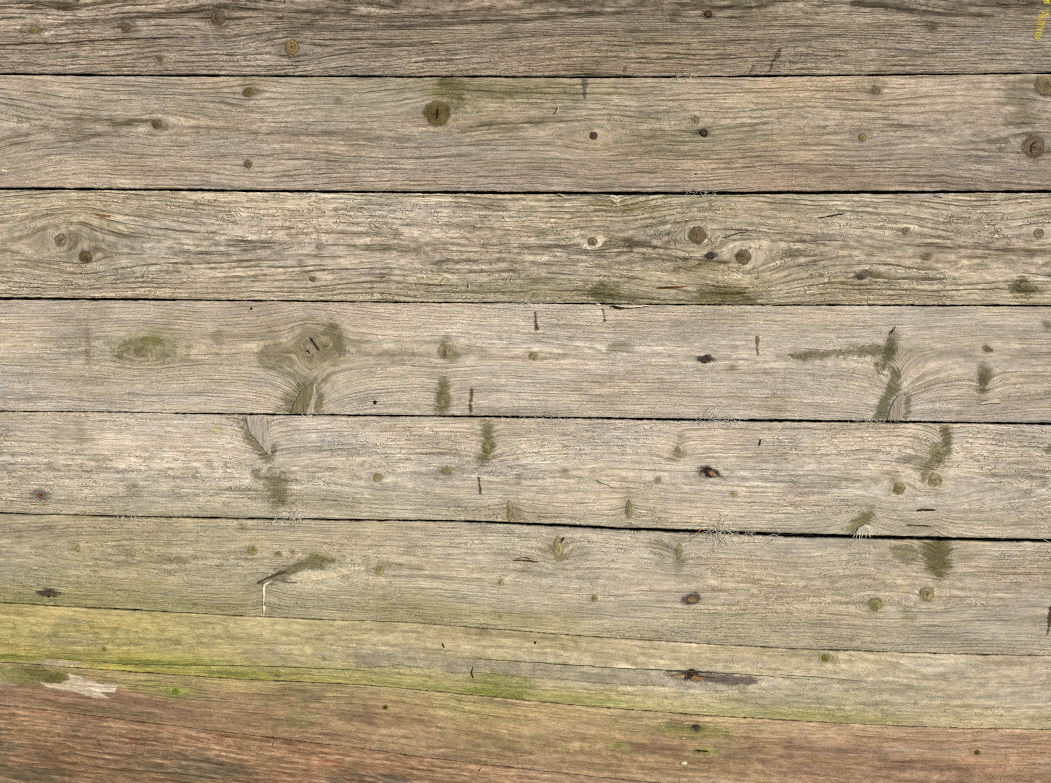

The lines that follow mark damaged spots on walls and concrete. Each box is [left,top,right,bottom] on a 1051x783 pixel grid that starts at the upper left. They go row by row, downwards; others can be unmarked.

damp [23,659,83,681]